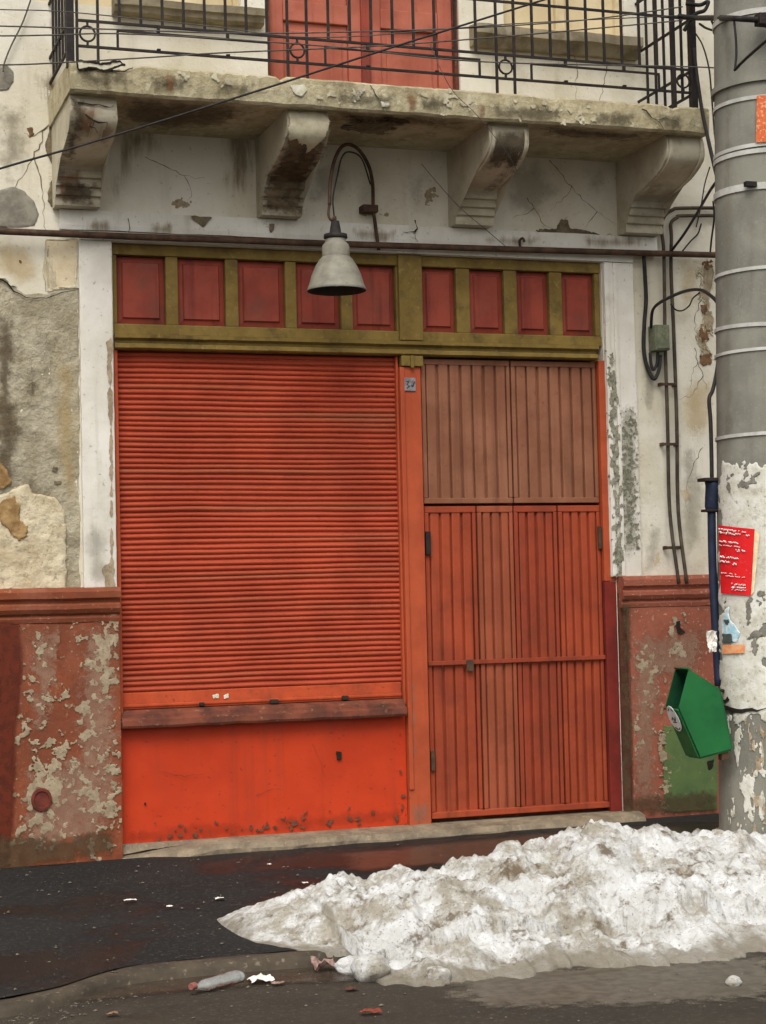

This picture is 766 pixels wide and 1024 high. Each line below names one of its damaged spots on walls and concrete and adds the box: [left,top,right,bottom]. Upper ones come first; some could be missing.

leakage [66,99,84,160]
leakage [128,102,240,129]
leakage [263,126,330,214]
leakage [490,132,525,187]
crack [513,160,613,235]
spalling [695,258,716,364]
leakage [0,324,19,475]
spalling [0,238,81,587]
leakage [615,409,640,554]
peeling [9,614,122,861]
peeling [632,606,703,811]
peeling [718,460,766,833]